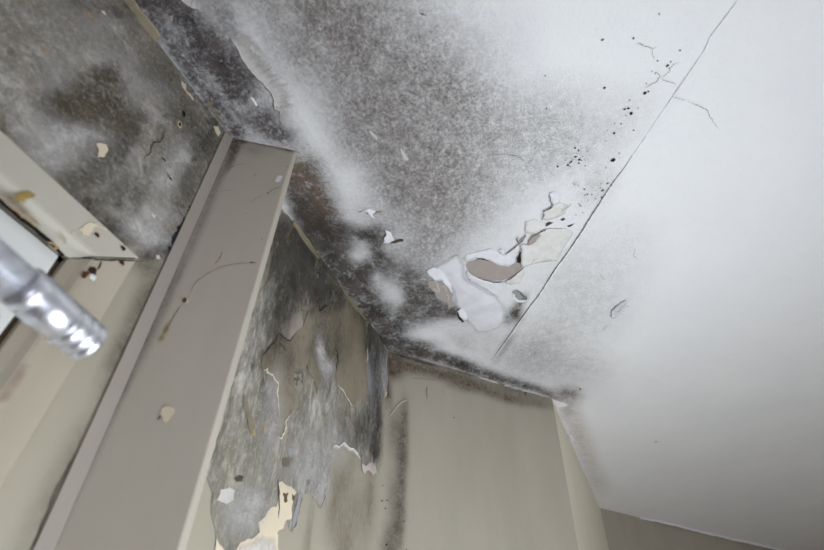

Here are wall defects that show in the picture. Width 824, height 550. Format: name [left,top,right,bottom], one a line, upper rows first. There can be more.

damp [50,68,135,164]
flaking render [0,0,224,260]
damp [135,0,290,159]
peeling [230,33,287,120]
damp [294,0,482,220]
crack [638,43,716,125]
flaking render [206,213,389,550]
damp [266,162,548,463]
peeling [437,191,573,332]